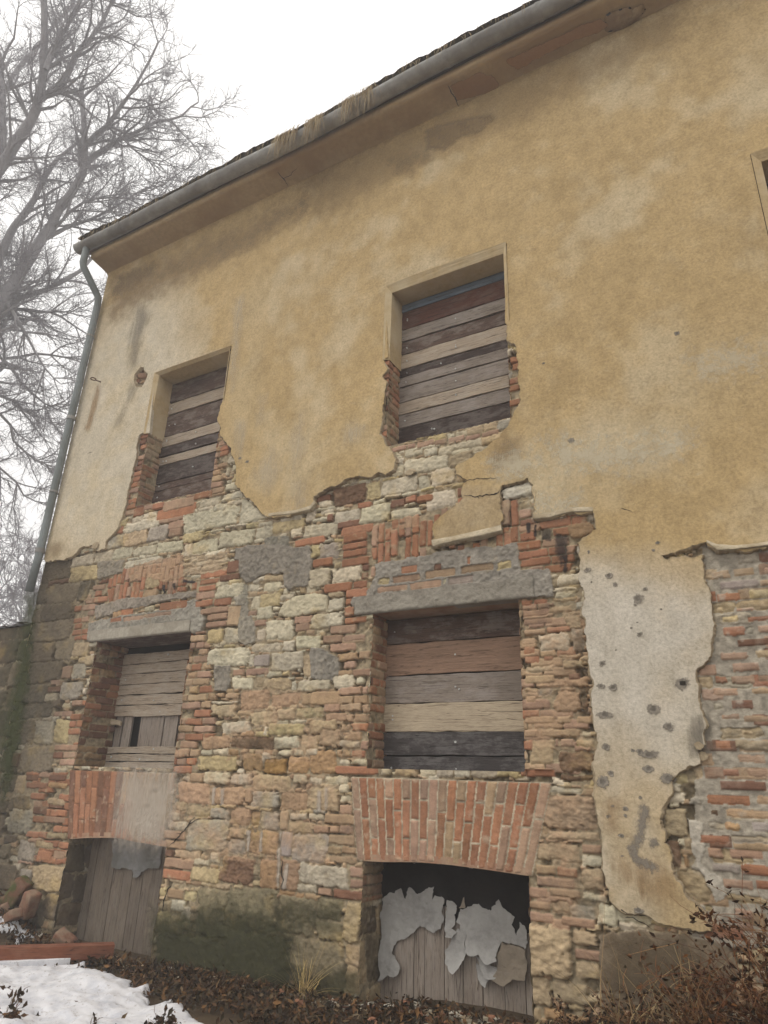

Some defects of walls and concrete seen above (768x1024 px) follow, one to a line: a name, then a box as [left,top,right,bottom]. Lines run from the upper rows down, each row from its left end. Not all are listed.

spalling [45,339,596,635]
crack [464,477,503,498]
spalling [581,648,628,841]
spalling [601,541,768,939]
peeling [110,839,162,878]
damp [627,805,659,871]
peeling [378,887,528,988]